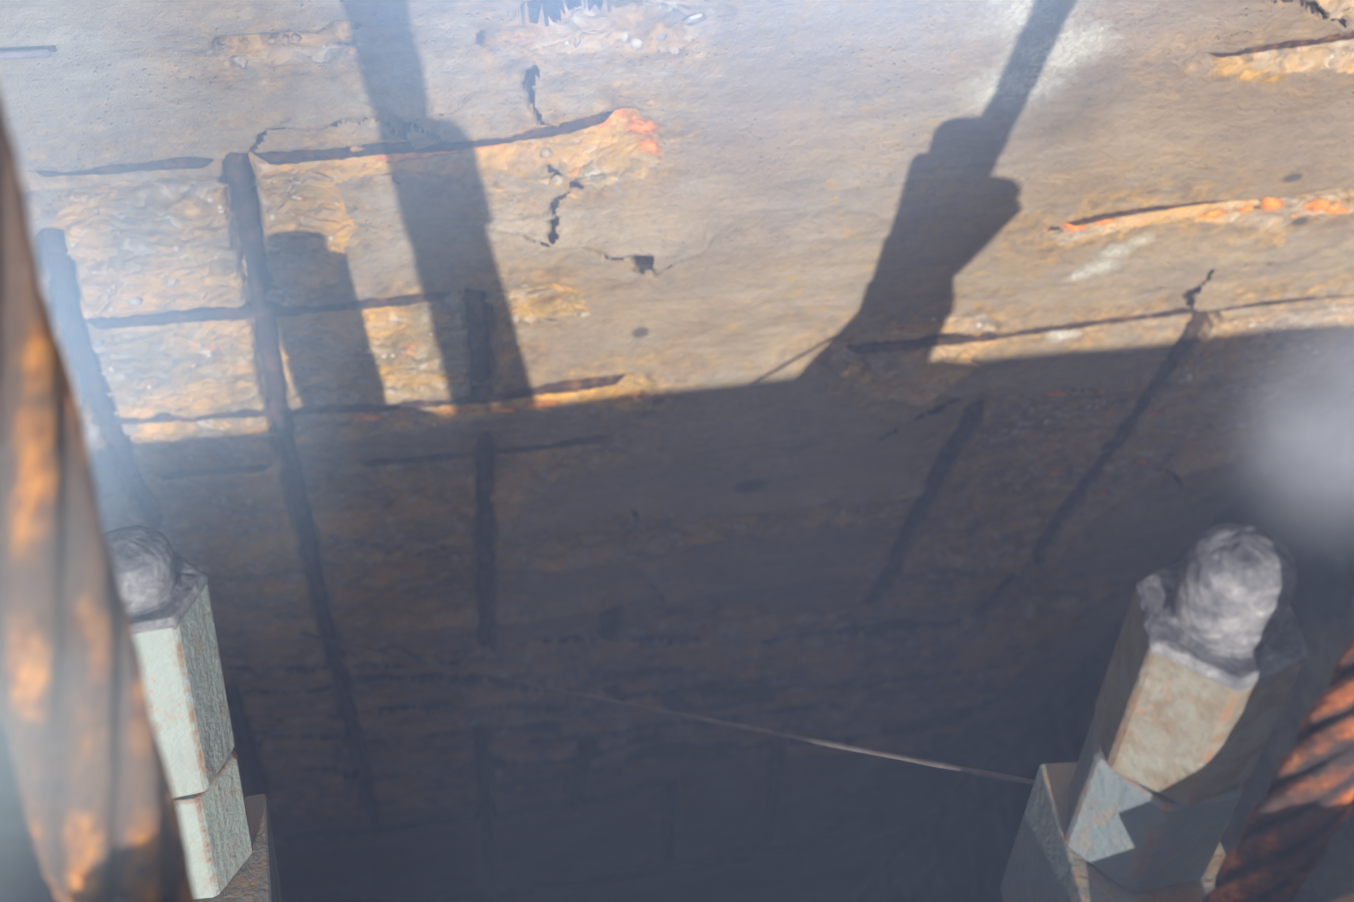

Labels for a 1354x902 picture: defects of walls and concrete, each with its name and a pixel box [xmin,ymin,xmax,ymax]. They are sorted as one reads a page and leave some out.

spalling [1214,0,1354,75]
crack [523,65,550,126]
corrosion [377,150,460,162]
corrosion [597,108,659,154]
crack [534,164,672,275]
corrosion [1063,219,1113,231]
spalling [1034,188,1354,245]
corrosion [1201,197,1282,218]
corrosion [1305,199,1350,214]
crack [1182,263,1271,311]
spalling [830,313,998,406]
spalling [1046,302,1354,564]